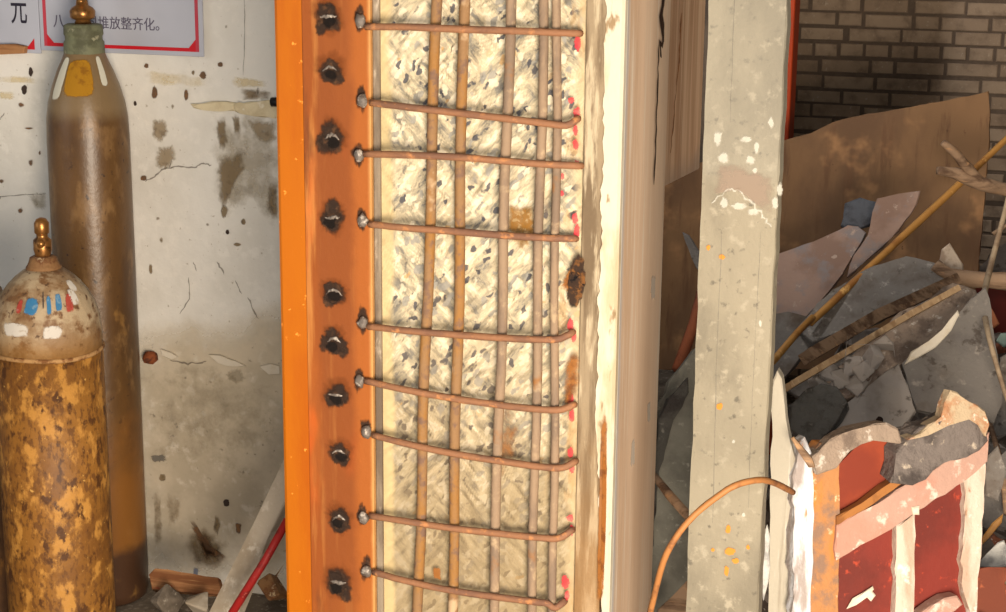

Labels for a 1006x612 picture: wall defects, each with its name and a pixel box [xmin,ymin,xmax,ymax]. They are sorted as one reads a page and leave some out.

crack [654,0,682,180]
corrosion [562,254,586,307]